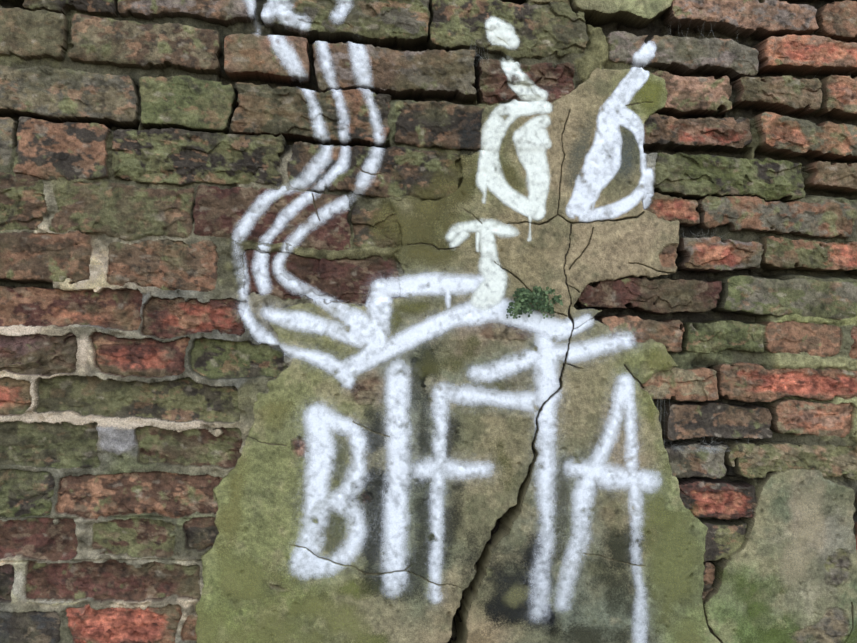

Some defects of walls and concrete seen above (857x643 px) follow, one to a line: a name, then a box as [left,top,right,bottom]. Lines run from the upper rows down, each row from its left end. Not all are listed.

spalling [658,243,679,271]
spalling [692,243,748,269]
spalling [822,243,857,273]
spalling [47,305,120,327]
spalling [158,301,245,334]
spalling [96,341,175,373]
crack [292,110,646,643]
spalling [0,385,32,410]
spalling [736,369,857,433]
spalling [689,486,756,519]
spalling [823,548,853,590]
spalling [71,609,172,643]